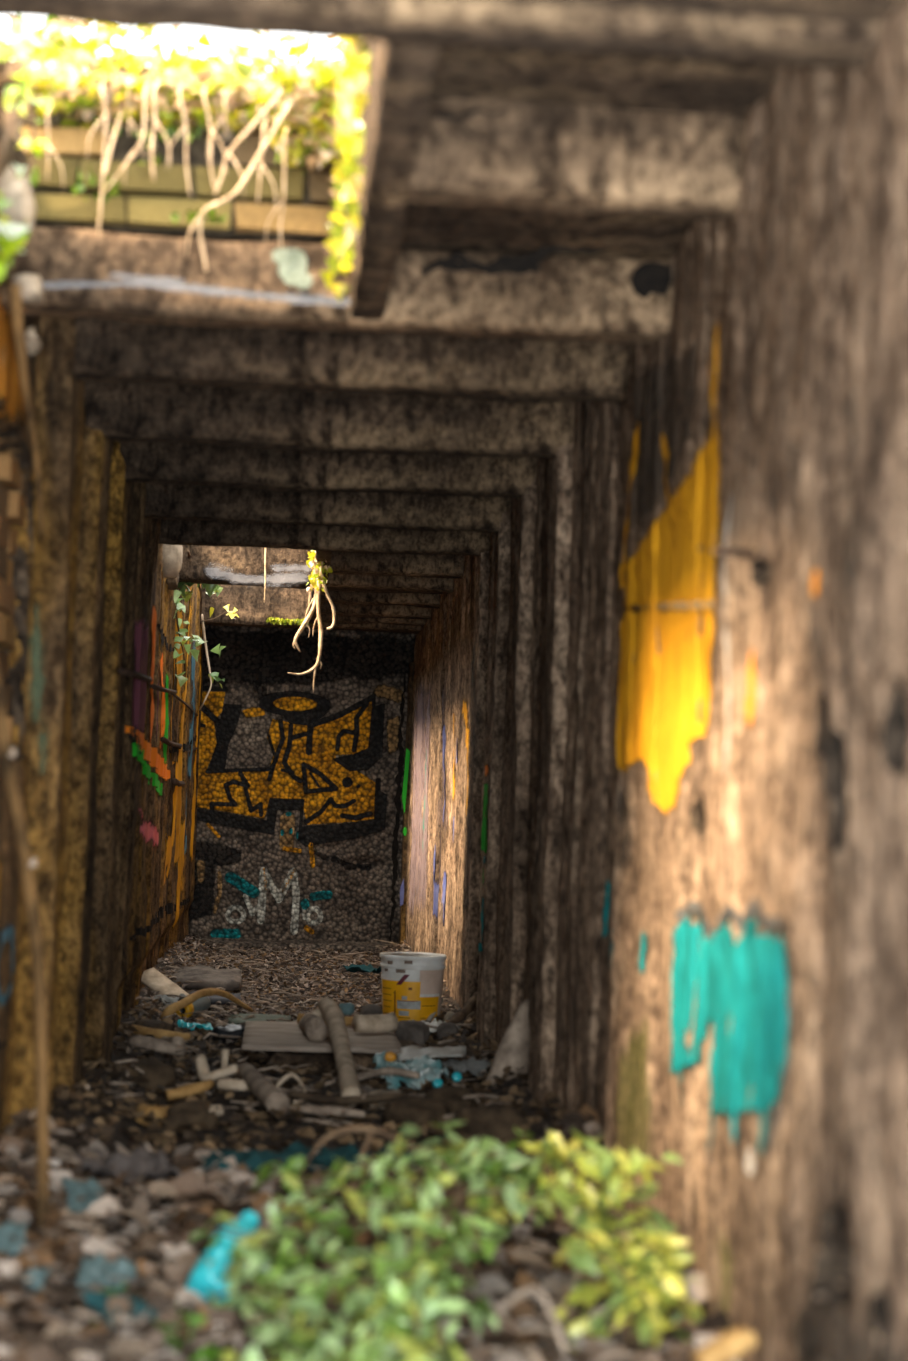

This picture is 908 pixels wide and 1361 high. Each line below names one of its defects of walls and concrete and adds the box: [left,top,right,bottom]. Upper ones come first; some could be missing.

peeling [619,421,670,590]
peeling [685,1030,693,1049]